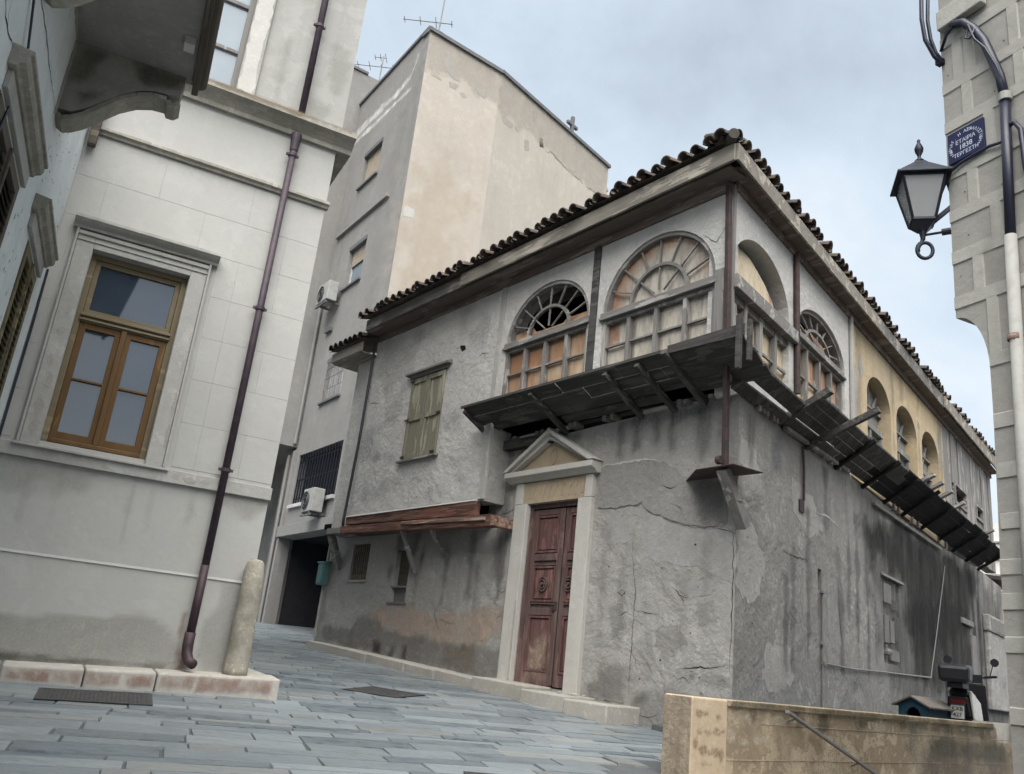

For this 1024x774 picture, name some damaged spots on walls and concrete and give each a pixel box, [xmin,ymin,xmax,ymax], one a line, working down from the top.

leakage [0,616,151,664]
crack [618,539,663,682]
leakage [910,559,981,691]